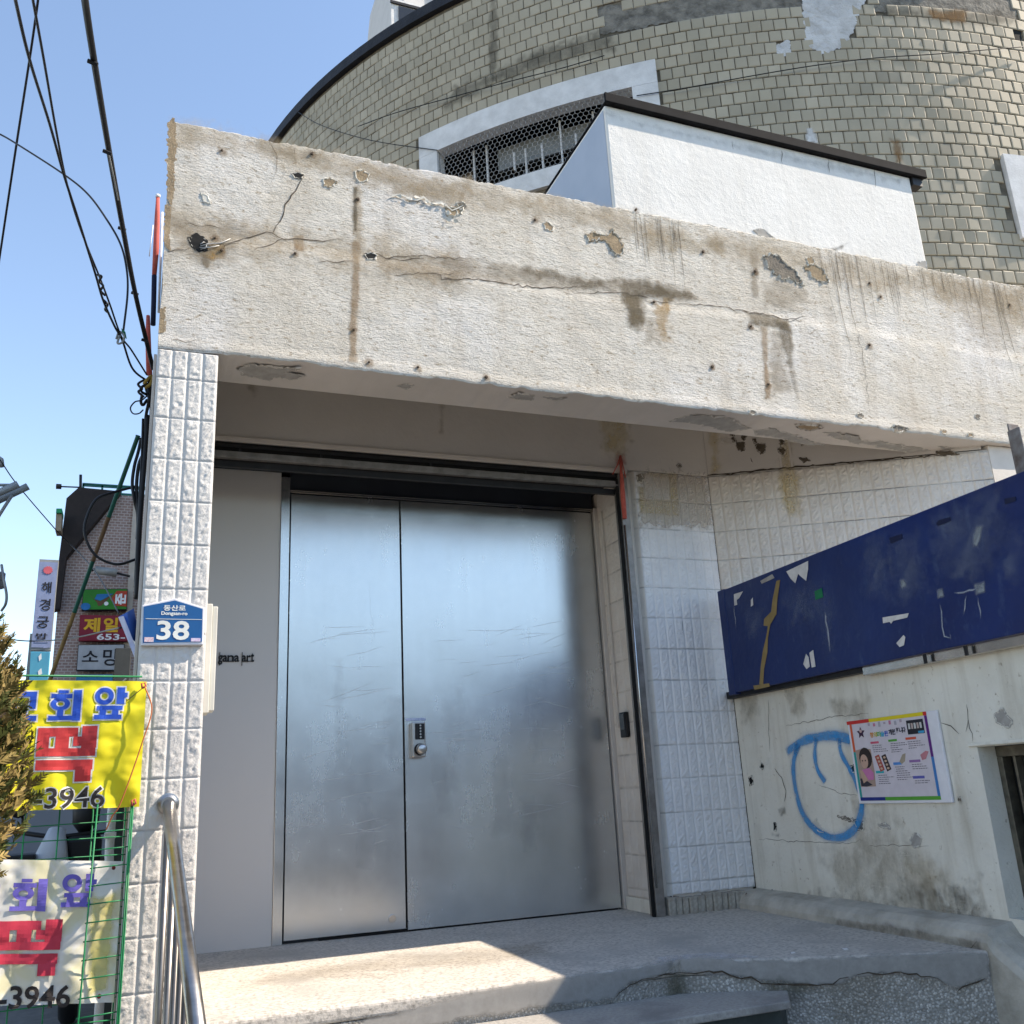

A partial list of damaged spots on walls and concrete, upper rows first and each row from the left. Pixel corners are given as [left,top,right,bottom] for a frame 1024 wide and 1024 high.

crack [168,178,348,263]
peeling [389,194,467,223]
peeling [585,228,624,256]
crack [375,253,806,322]
damp [623,282,692,325]
peeling [763,252,830,286]
peeling [237,363,305,382]
peeling [669,409,974,463]